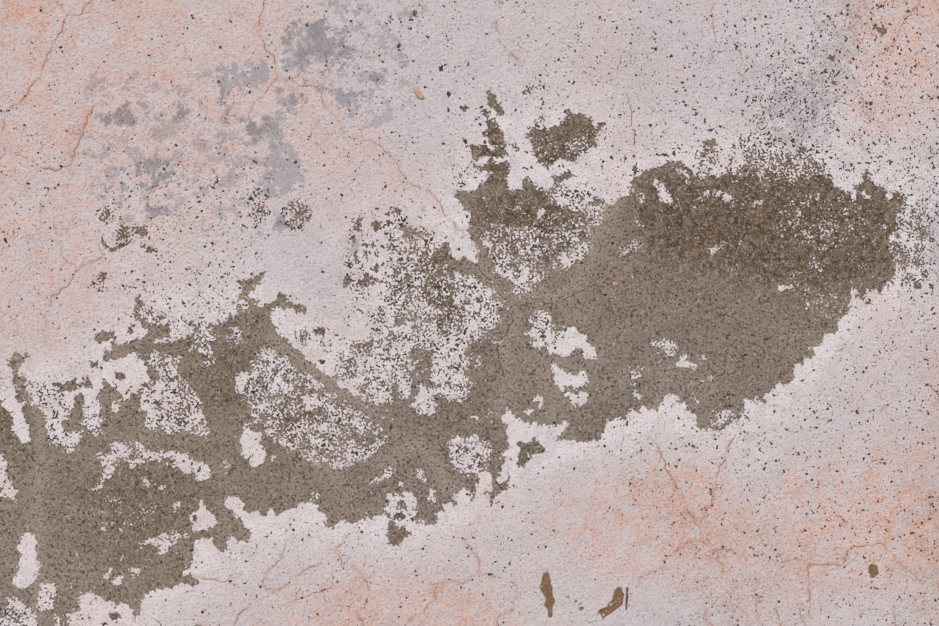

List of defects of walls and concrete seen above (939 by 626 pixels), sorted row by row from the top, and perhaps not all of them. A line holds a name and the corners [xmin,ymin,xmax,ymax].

peeling [486,90,505,116]
peeling [525,109,607,171]
peeling [700,138,719,158]
peeling [101,224,158,254]
peeling [345,216,377,268]
peeling [356,272,379,289]
peeling [339,338,383,382]
peeling [52,377,93,392]
peeling [516,436,545,468]
peeling [385,499,412,547]
spalling [540,572,555,617]
spalling [597,587,624,619]